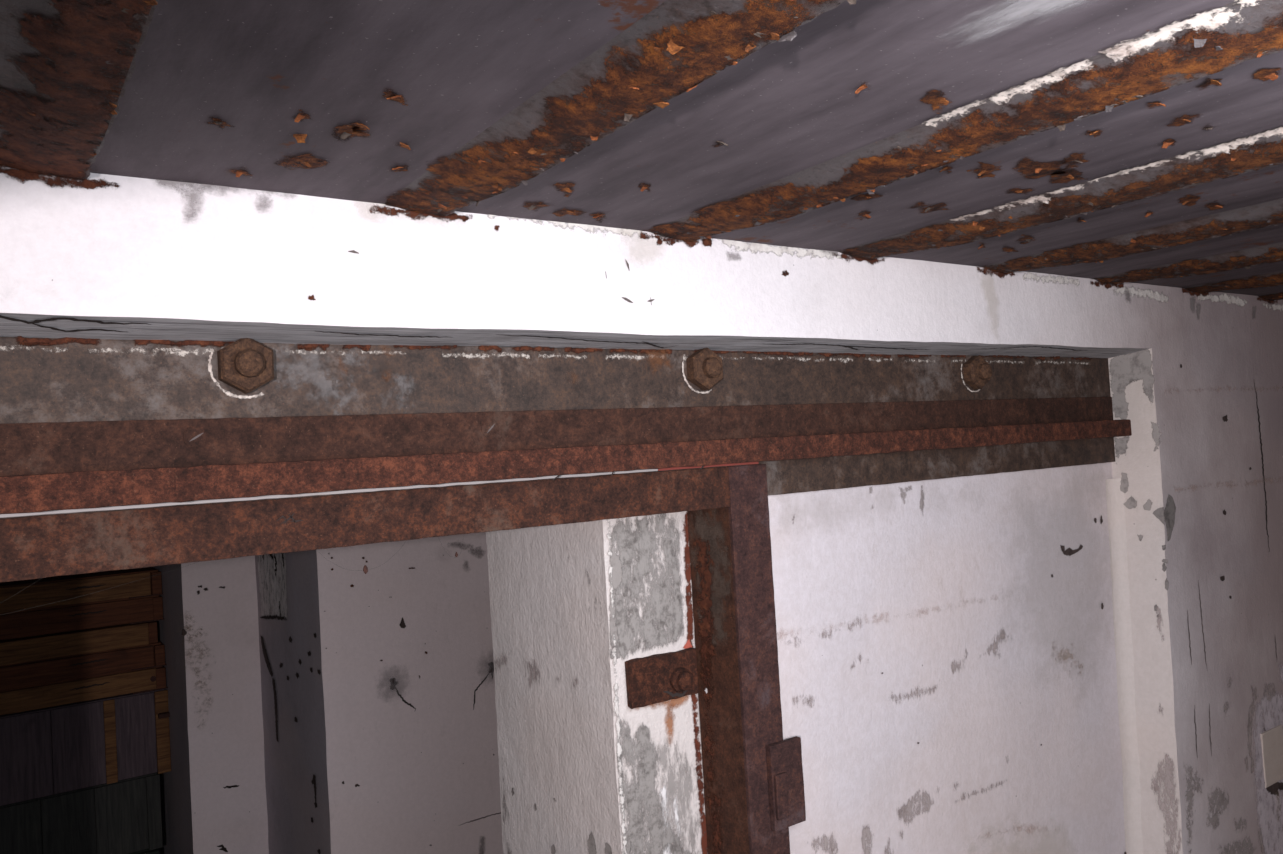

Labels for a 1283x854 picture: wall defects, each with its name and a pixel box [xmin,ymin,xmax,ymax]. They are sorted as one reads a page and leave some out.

rust [0,0,158,189]
rust [369,0,856,223]
rust [640,14,1283,304]
crack [0,315,151,332]
rust [133,339,235,347]
rust [479,345,672,355]
peeling [1109,349,1155,419]
rust [683,513,694,648]
spalling [1114,436,1176,590]
spalling [587,513,692,854]
rust [649,694,708,854]
spalling [1266,782,1283,796]